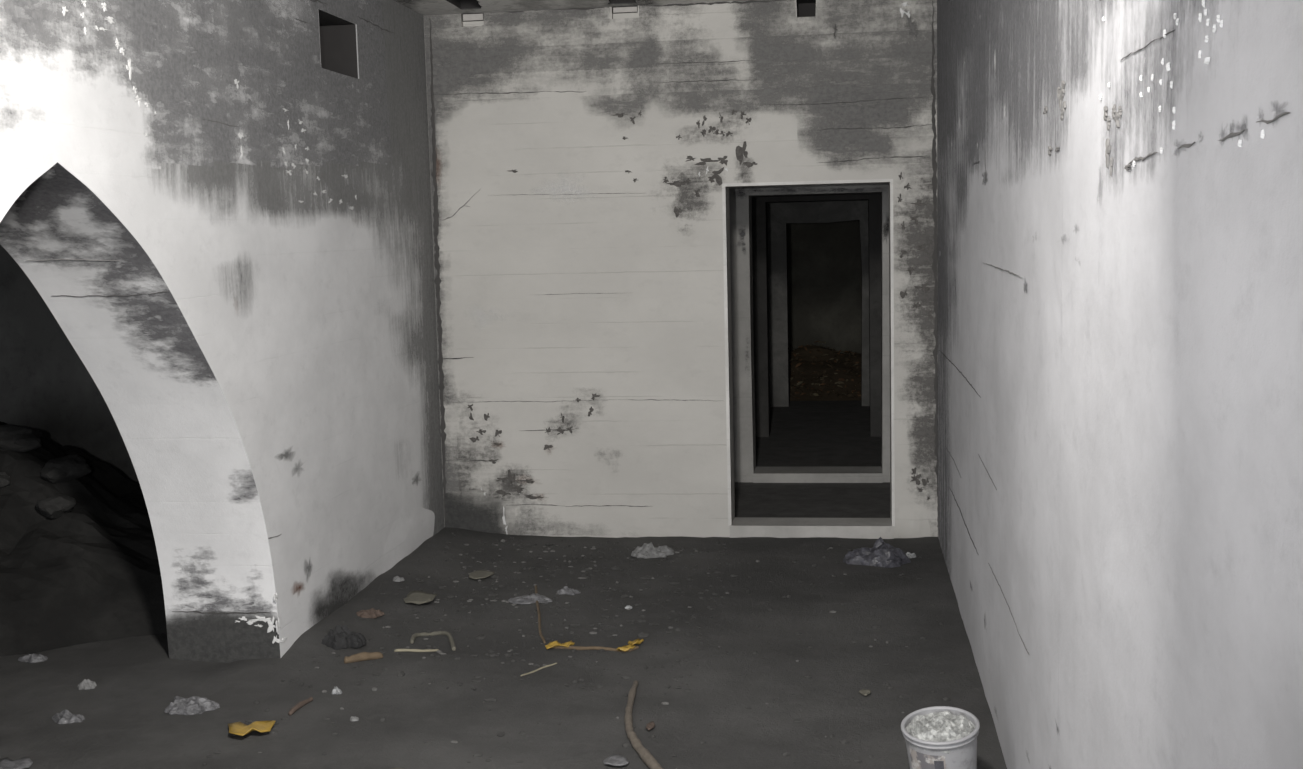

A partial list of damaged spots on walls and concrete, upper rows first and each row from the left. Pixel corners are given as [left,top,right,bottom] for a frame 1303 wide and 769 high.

crack [1121,30,1174,60]
spalling [663,109,757,197]
leakage [1008,104,1059,161]
leakage [1109,45,1172,174]
crack [1128,112,1289,164]
leakage [0,210,161,352]
leakage [137,0,988,576]
spalling [468,404,544,534]
spalling [544,414,572,450]